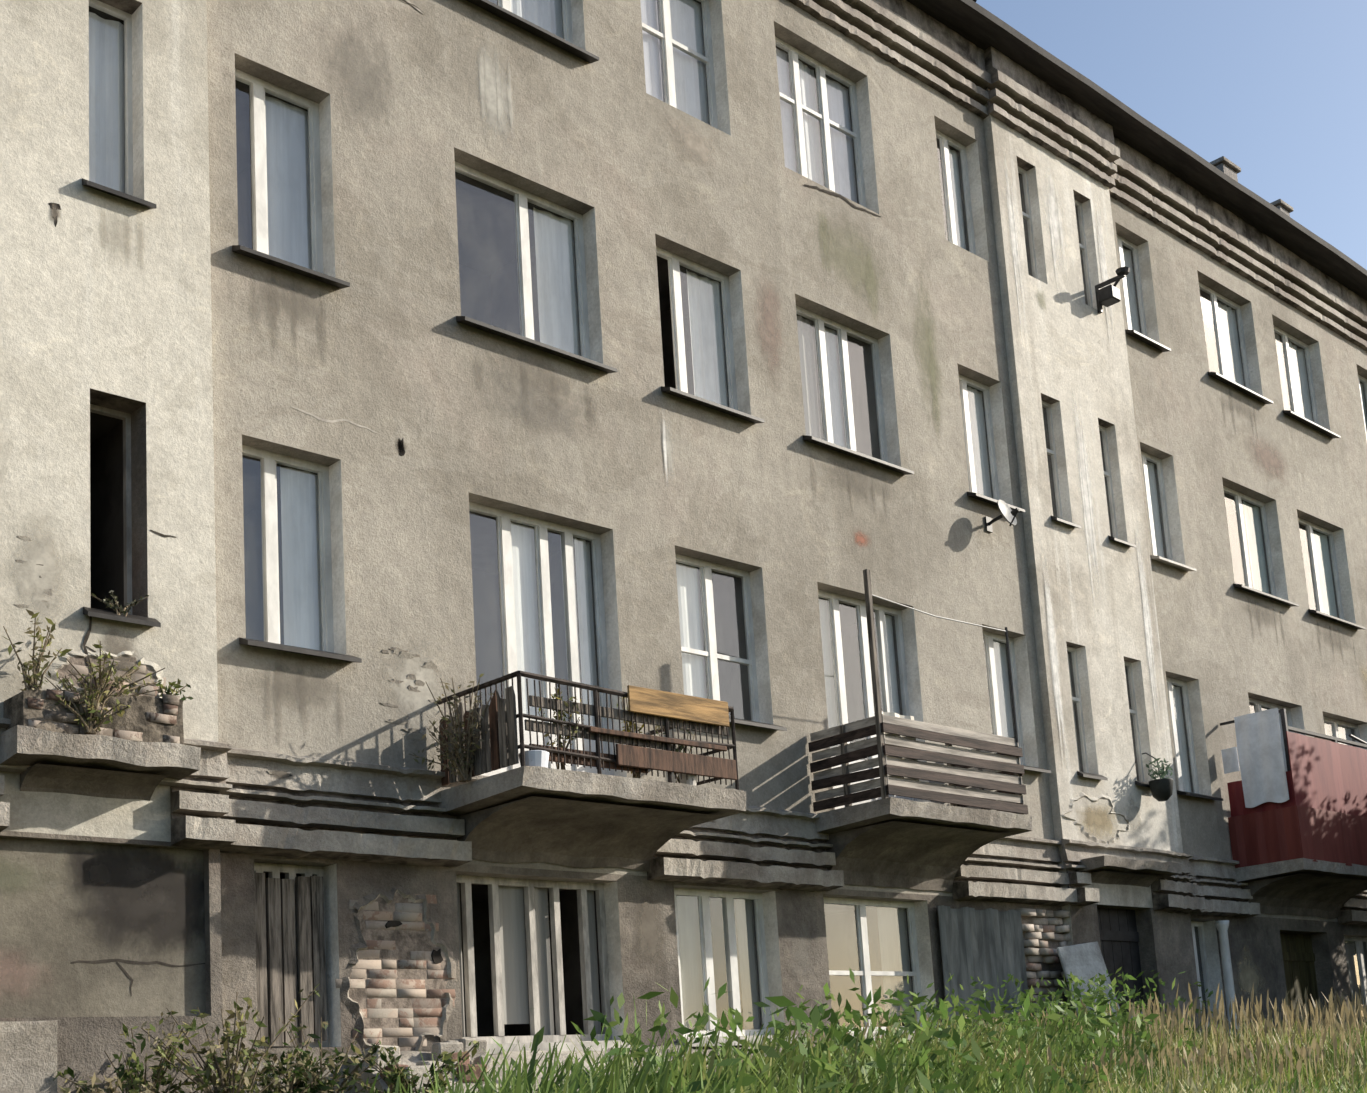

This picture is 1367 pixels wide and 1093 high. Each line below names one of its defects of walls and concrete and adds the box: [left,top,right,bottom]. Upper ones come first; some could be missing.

flaking render [1060,792,1140,844]
water stain [76,853,202,947]
crack [71,959,205,996]
flaking render [335,885,456,1051]